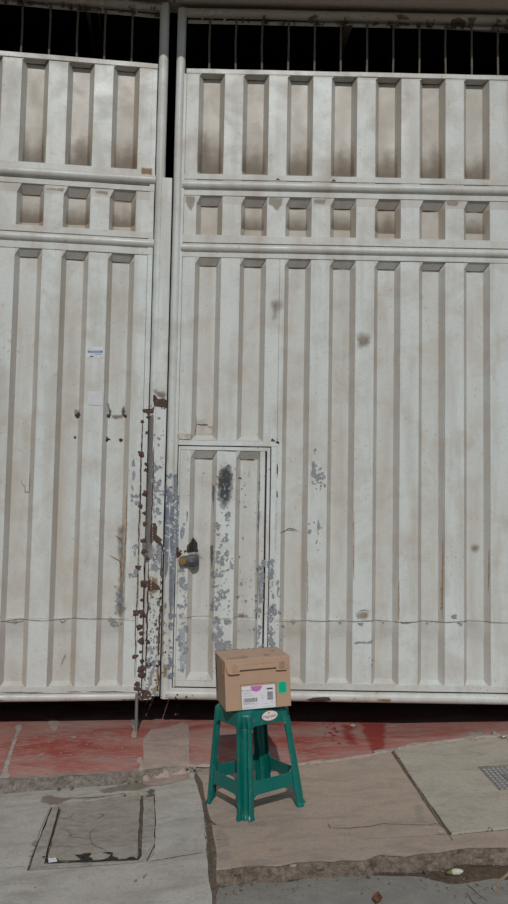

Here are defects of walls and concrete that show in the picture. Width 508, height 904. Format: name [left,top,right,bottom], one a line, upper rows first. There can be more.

corrosion [109,493,127,628]
peeling [130,414,188,696]
corrosion [123,391,196,702]
peeling [210,462,285,651]
peeling [311,448,326,490]